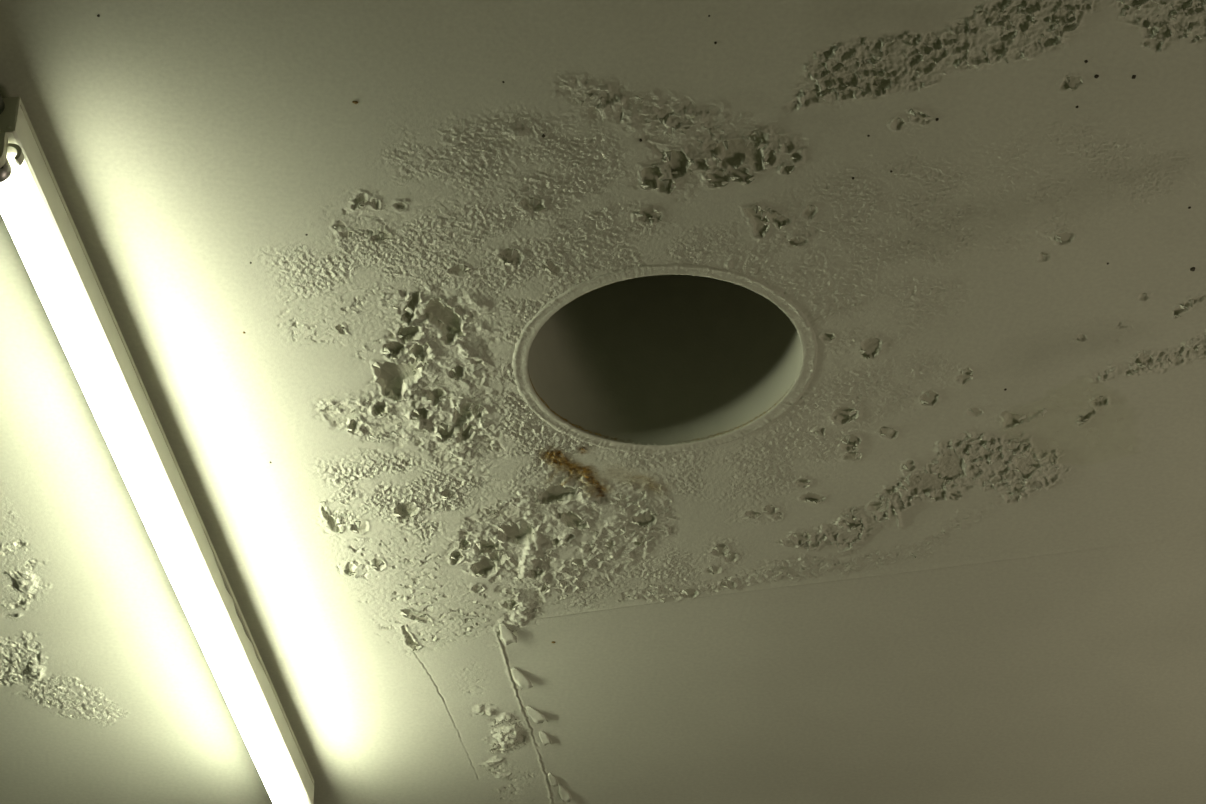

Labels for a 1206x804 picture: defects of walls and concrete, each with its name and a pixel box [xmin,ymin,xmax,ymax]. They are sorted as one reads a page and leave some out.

spalling [539,0,1206,209]
spalling [313,178,414,238]
peeling [1082,282,1206,390]
spalling [258,275,686,670]
rust [545,447,604,497]
spalling [770,424,1081,559]
peeling [0,473,136,731]
crack [417,660,480,783]
crack [496,623,572,804]